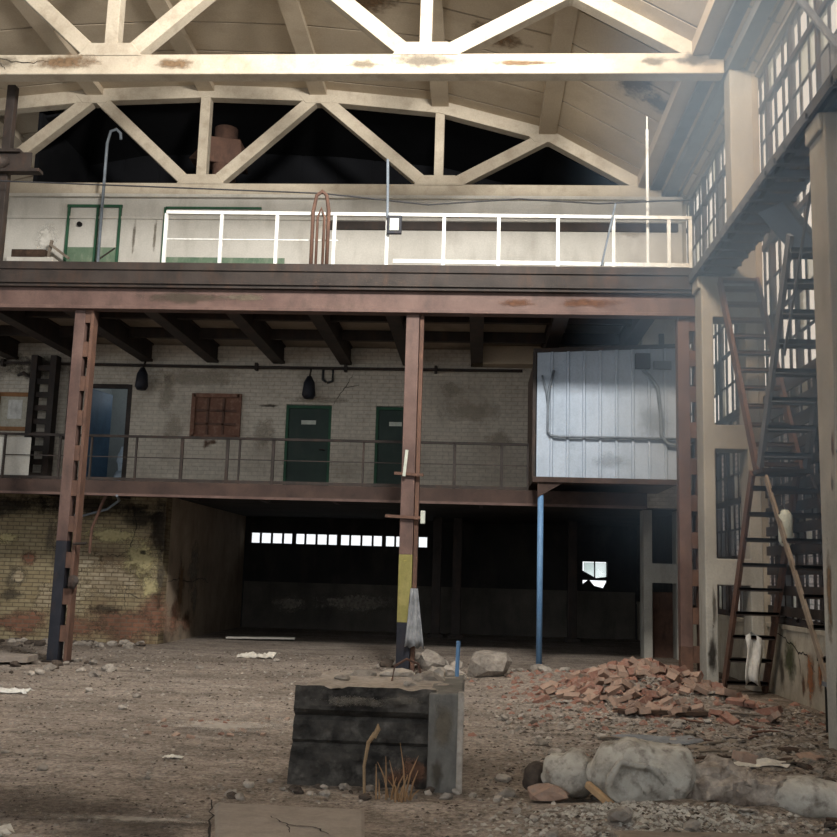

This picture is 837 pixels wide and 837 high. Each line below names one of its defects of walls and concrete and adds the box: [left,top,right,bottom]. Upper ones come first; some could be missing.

peeling [4,551,36,599]
peeling [0,584,52,637]
peeling [66,529,176,642]
damp [780,643,796,681]